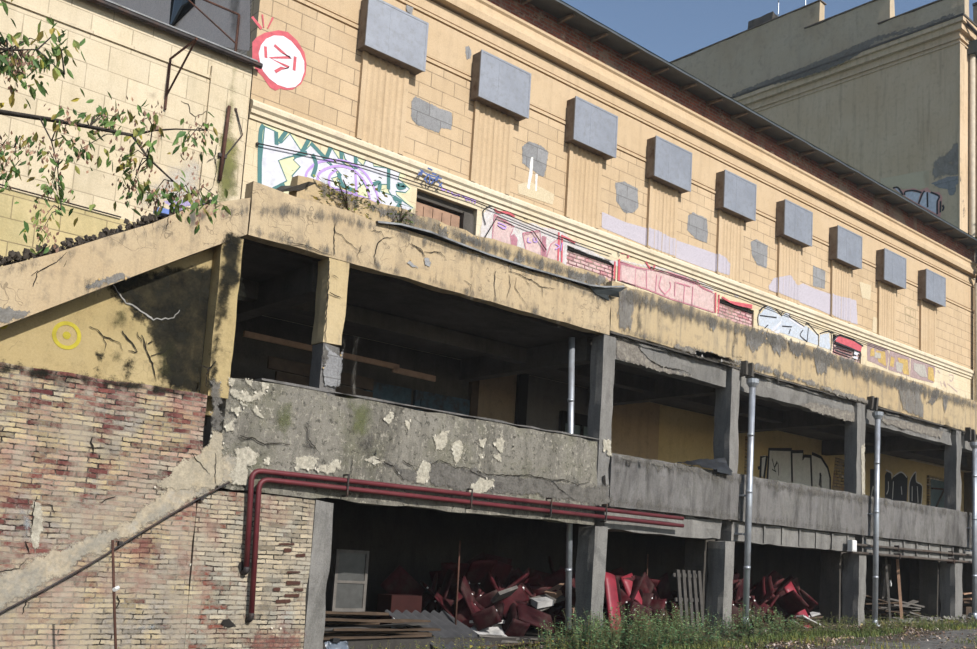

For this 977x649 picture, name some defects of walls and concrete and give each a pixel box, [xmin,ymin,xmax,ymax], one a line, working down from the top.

flaking render [930,143,961,179]
water stain [0,233,246,395]
crack [90,284,180,378]
water stain [626,289,975,409]
peeling [294,455,341,474]
flaking render [252,627,299,649]